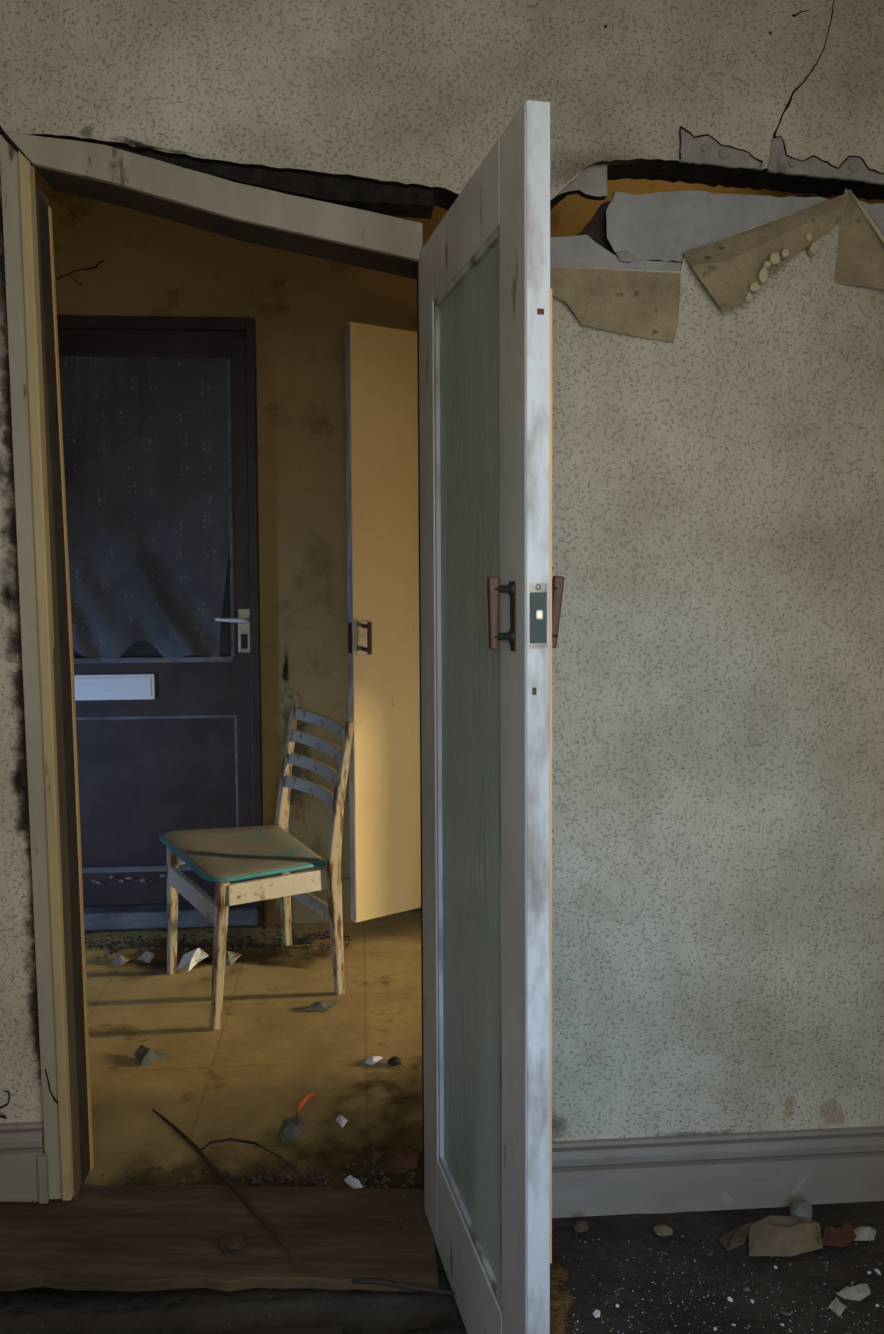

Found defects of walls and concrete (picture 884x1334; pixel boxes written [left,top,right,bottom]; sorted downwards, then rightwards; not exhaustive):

crack [768,0,835,165]
crack [0,126,32,166]
flaking render [556,164,607,201]
flaking render [679,126,884,185]
water stain [0,178,41,1076]